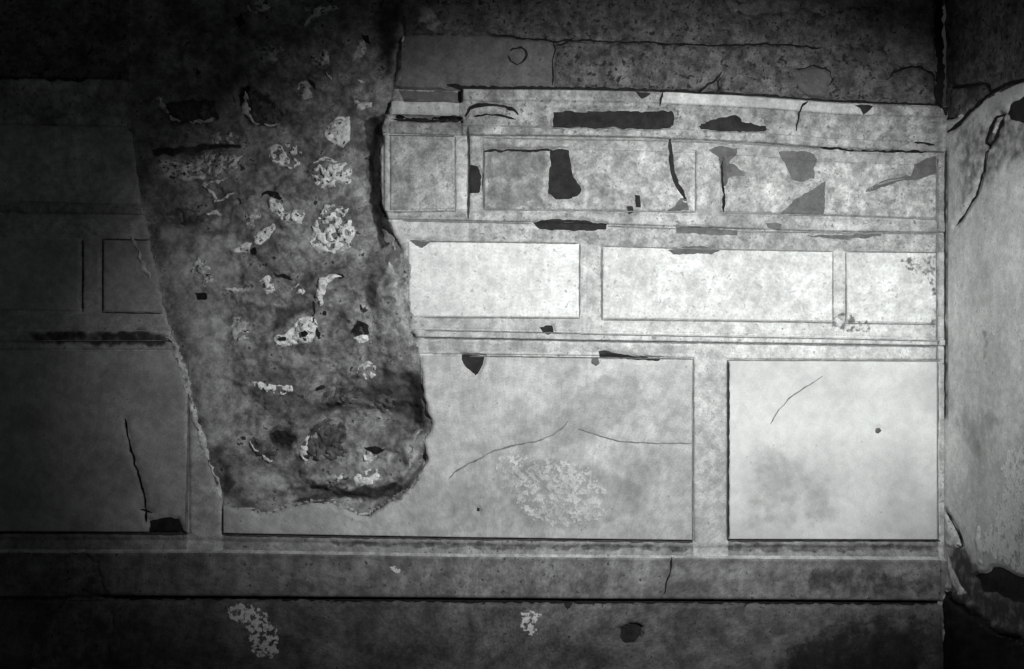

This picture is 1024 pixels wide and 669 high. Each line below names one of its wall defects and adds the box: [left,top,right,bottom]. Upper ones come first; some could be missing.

spalling [553,92,675,130]
spalling [699,115,767,132]
spalling [548,149,582,199]
crack [394,0,1024,424]
spalling [766,150,826,230]
spalling [126,0,462,516]
crack [125,419,152,522]
water stain [495,454,607,528]
crack [449,421,692,479]
spalling [149,517,184,532]
spalling [980,567,1024,601]
water stain [226,603,279,659]